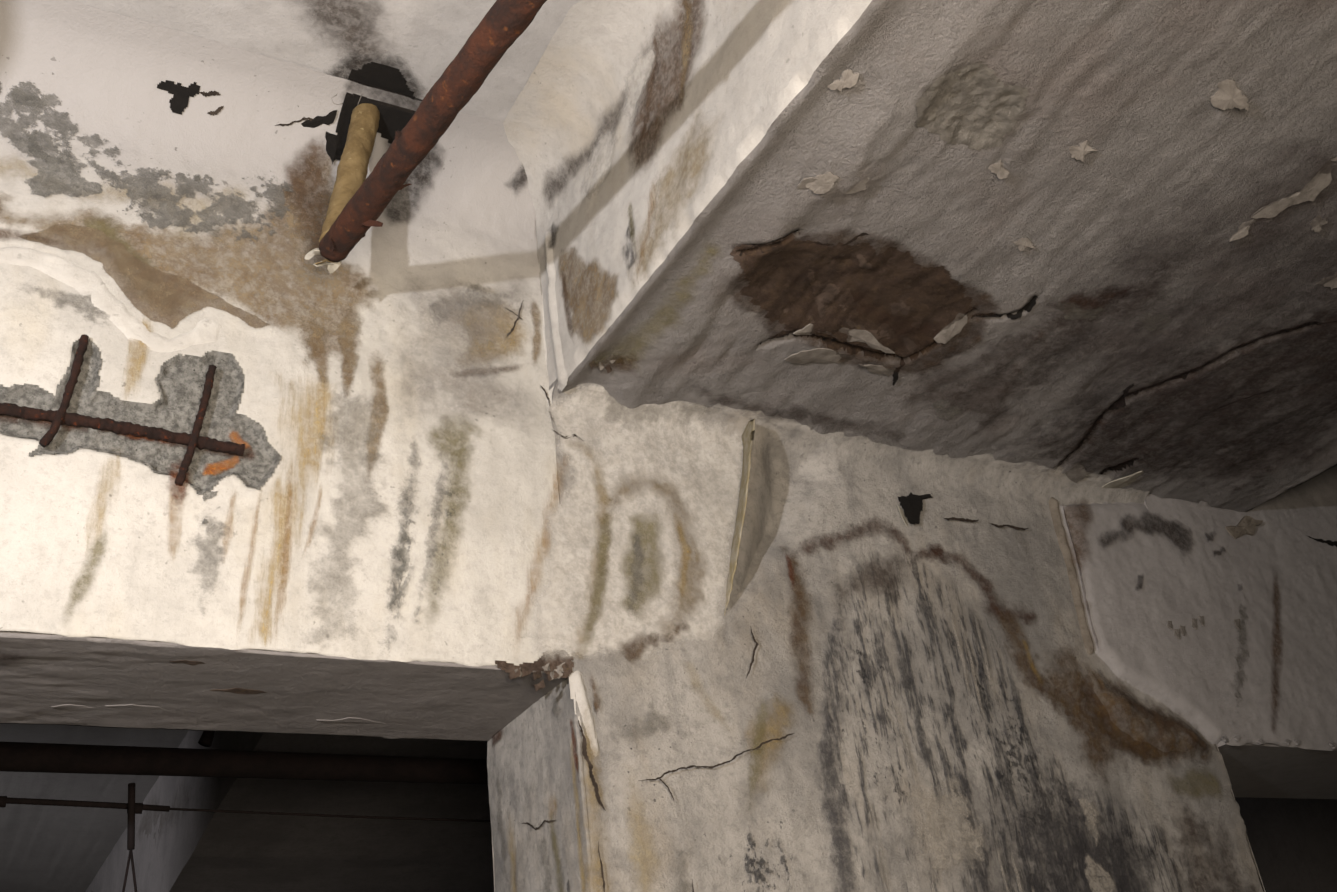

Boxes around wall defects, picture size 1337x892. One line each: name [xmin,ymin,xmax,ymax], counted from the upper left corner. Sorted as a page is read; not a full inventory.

peeling [0,80,293,241]
damp [624,0,703,165]
spalling [0,246,282,495]
damp [0,145,369,476]
corrosion [170,433,254,497]
damp [367,362,388,469]
spalling [897,492,932,527]
crack [1306,535,1337,547]
spalling [495,650,574,691]
crack [578,720,606,892]
crack [639,733,794,800]
damp [786,521,1239,892]